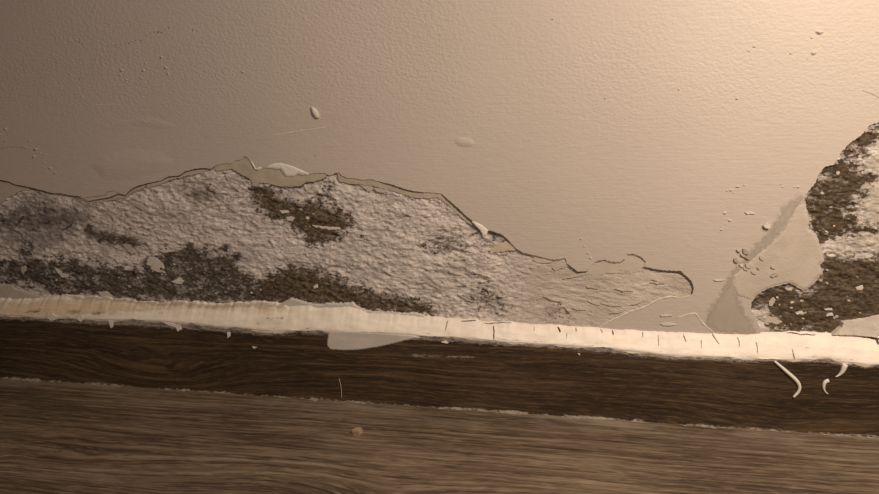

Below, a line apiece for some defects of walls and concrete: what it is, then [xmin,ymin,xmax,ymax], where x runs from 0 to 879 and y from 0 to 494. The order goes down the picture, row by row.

damp [84,224,147,248]
damp [0,242,436,316]
mould [248,181,354,247]
peeling [0,156,693,327]
crack [382,182,694,294]
peeling [707,122,879,334]
damp [751,126,879,333]